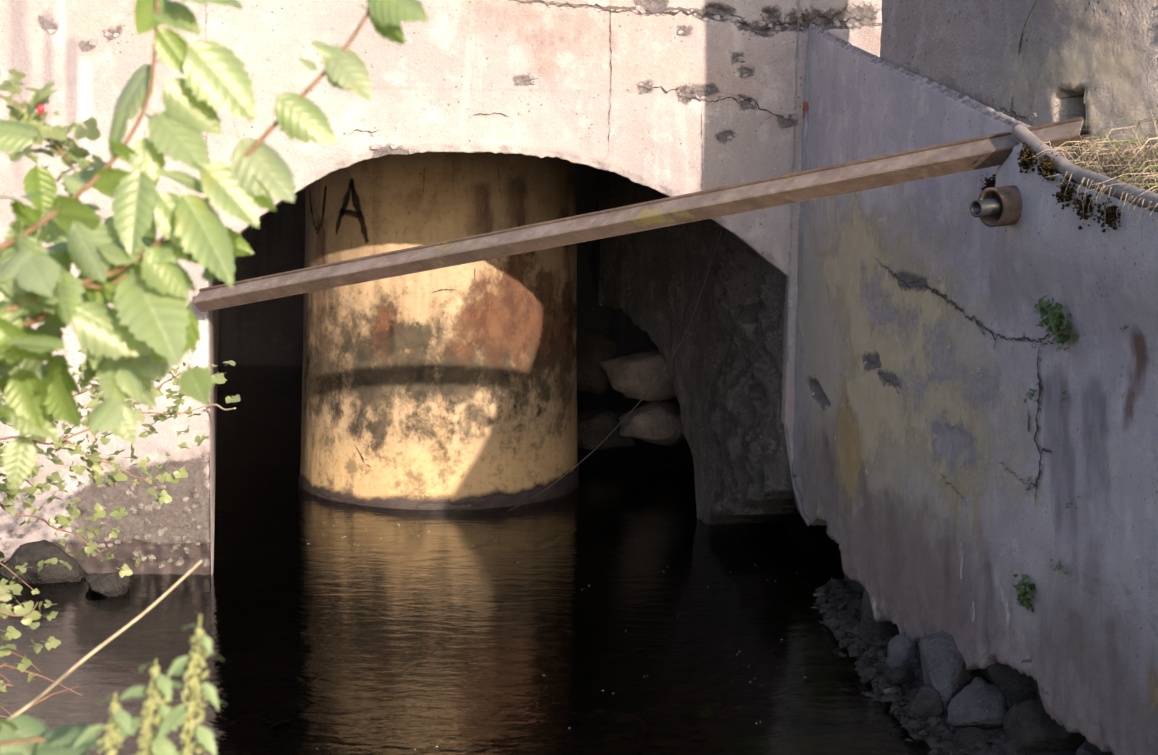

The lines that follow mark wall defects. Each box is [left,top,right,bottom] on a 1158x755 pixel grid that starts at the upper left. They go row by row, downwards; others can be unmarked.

spalling [634,0,668,16]
spalling [38,16,57,34]
spalling [677,1,881,44]
spalling [79,26,122,51]
spalling [732,53,754,78]
spalling [638,80,653,94]
spalling [676,83,719,104]
spalling [740,95,757,110]
peeling [808,195,986,484]
water stain [304,277,577,457]
crack [873,257,1054,500]
corrosion [1126,334,1145,412]